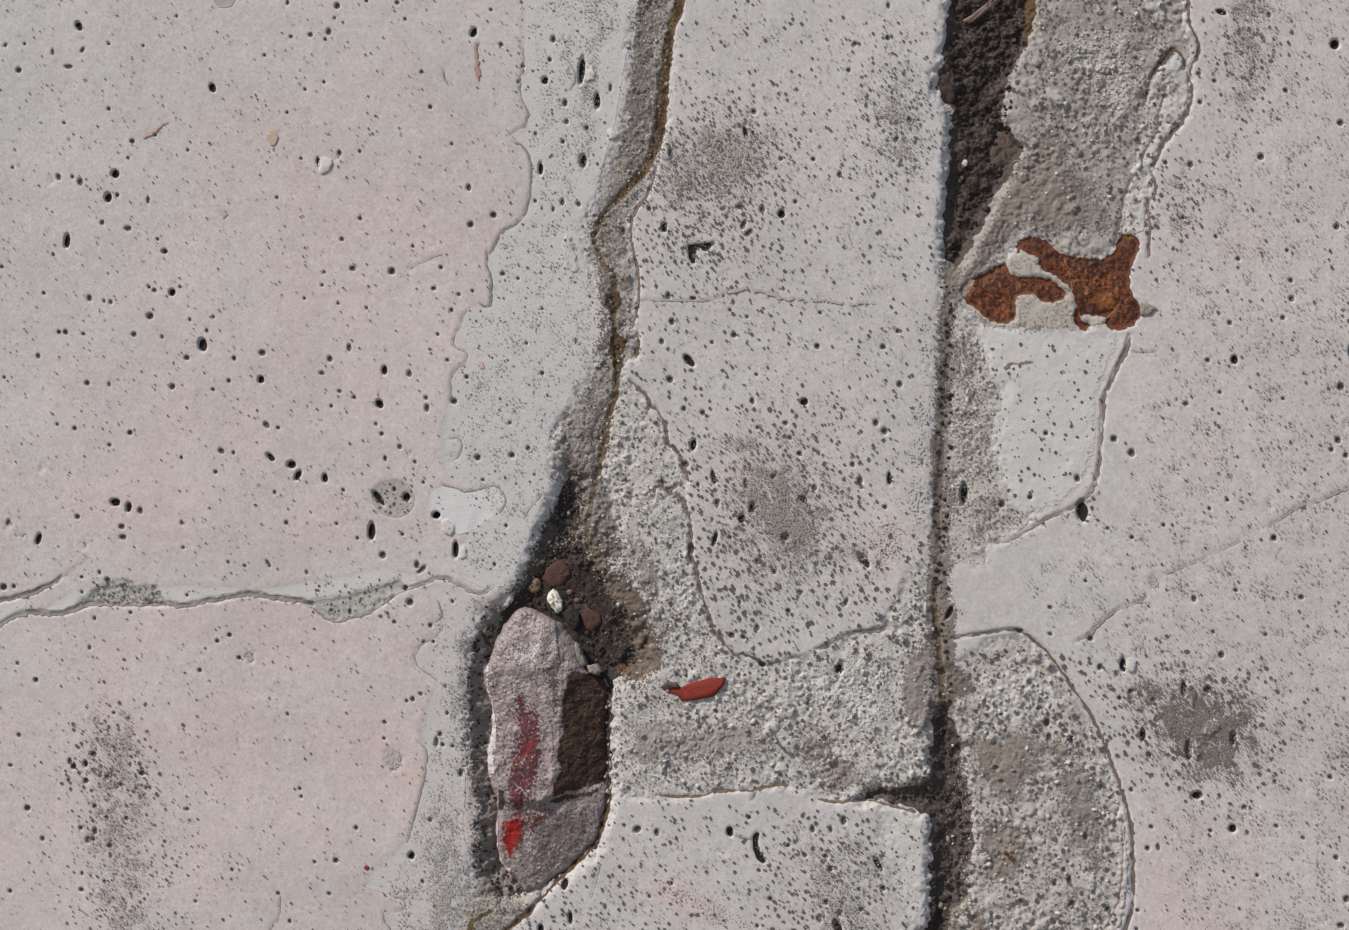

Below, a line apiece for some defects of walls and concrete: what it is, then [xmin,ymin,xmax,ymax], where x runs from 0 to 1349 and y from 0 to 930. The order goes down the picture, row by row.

crack [449,46,532,399]
crack [584,0,889,666]
crack [944,267,969,395]
rust [964,234,1138,328]
spalling [268,454,302,480]
crack [442,437,543,519]
peeling [366,0,1190,930]
crack [933,442,944,541]
peeling [47,567,418,621]
crack [0,555,494,680]
crack [932,488,1349,930]
crack [505,786,612,930]